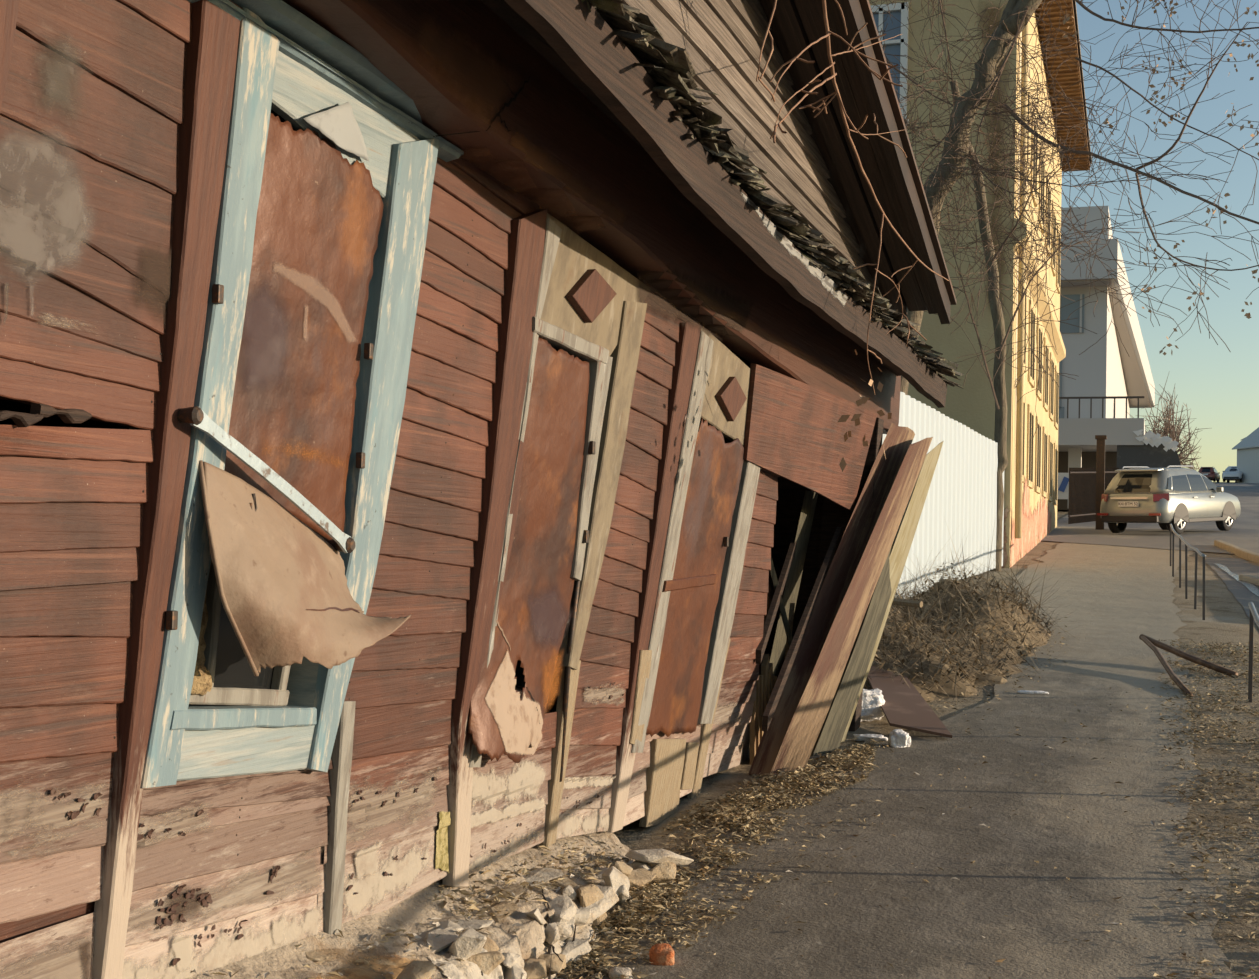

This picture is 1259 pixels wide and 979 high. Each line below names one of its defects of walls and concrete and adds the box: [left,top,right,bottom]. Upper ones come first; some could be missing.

water stain [0,137,89,277]